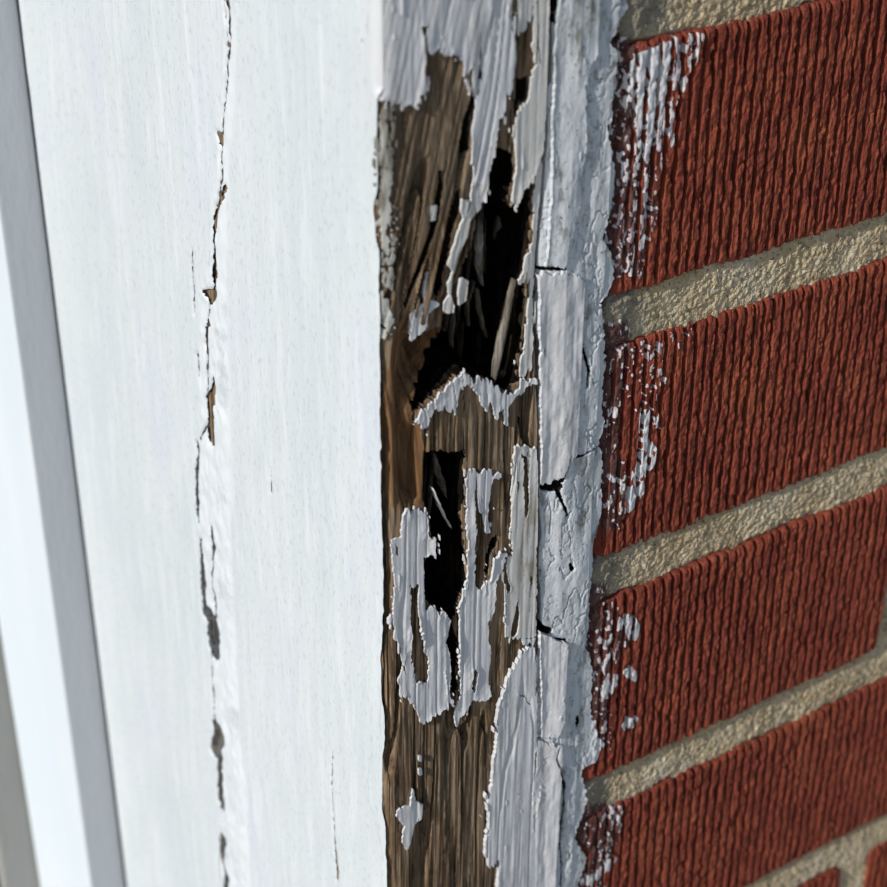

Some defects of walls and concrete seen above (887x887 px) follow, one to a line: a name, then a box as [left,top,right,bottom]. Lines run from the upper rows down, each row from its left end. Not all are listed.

crack [223,0,231,59]
crack [549,0,558,24]
peeling [630,41,673,153]
peeling [372,0,549,437]
crack [192,81,228,812]
crack [539,448,595,516]
peeling [620,615,640,641]
peeling [387,444,568,887]
peeling [600,665,637,699]
peeling [622,715,639,731]
crack [219,833,229,887]
peeling [580,855,617,886]